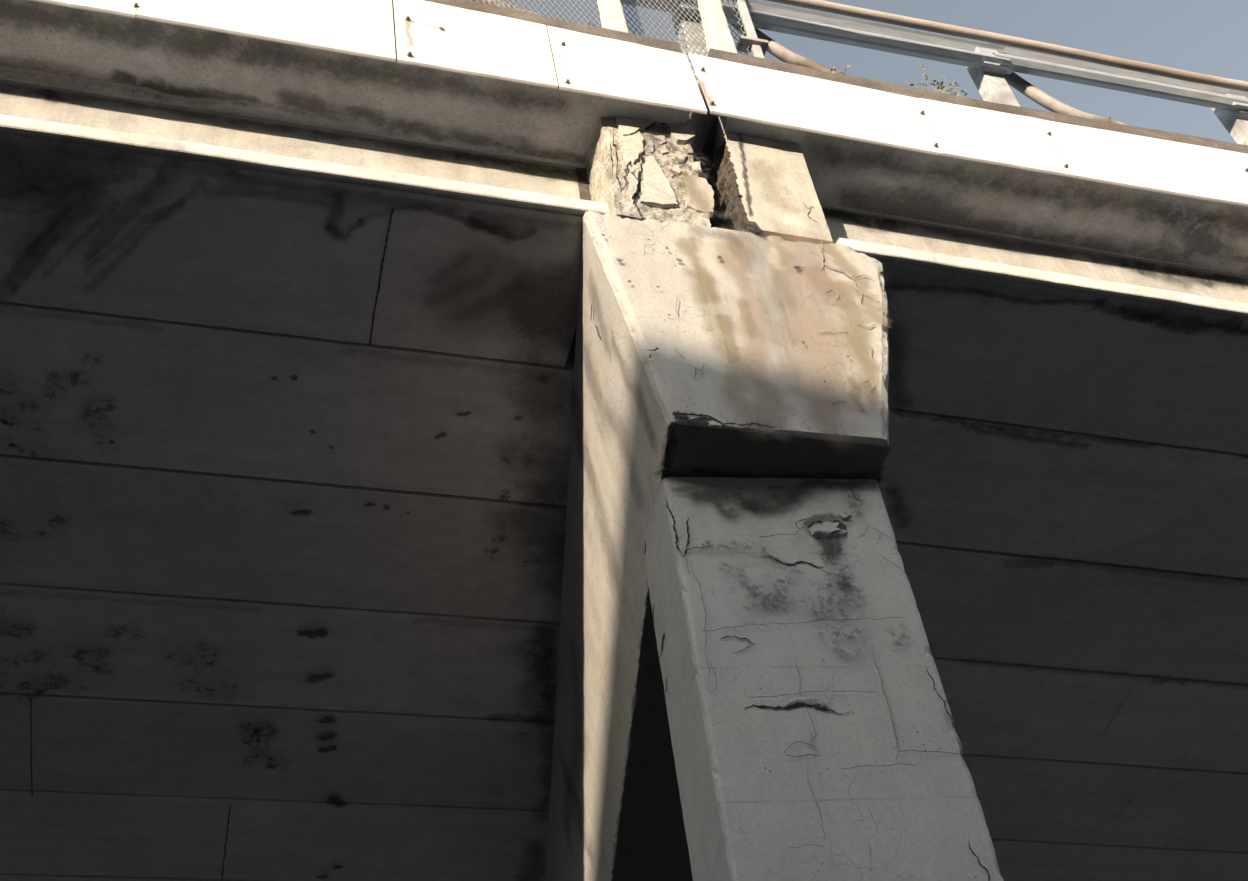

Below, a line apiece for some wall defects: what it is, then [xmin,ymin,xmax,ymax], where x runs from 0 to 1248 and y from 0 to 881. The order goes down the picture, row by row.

crack [610,122,666,205]
spalling [616,116,762,235]
crack [644,498,754,693]
crack [762,556,830,574]
spalling [759,511,851,553]
damp [812,533,859,616]
crack [744,647,972,848]
crack [968,839,990,881]